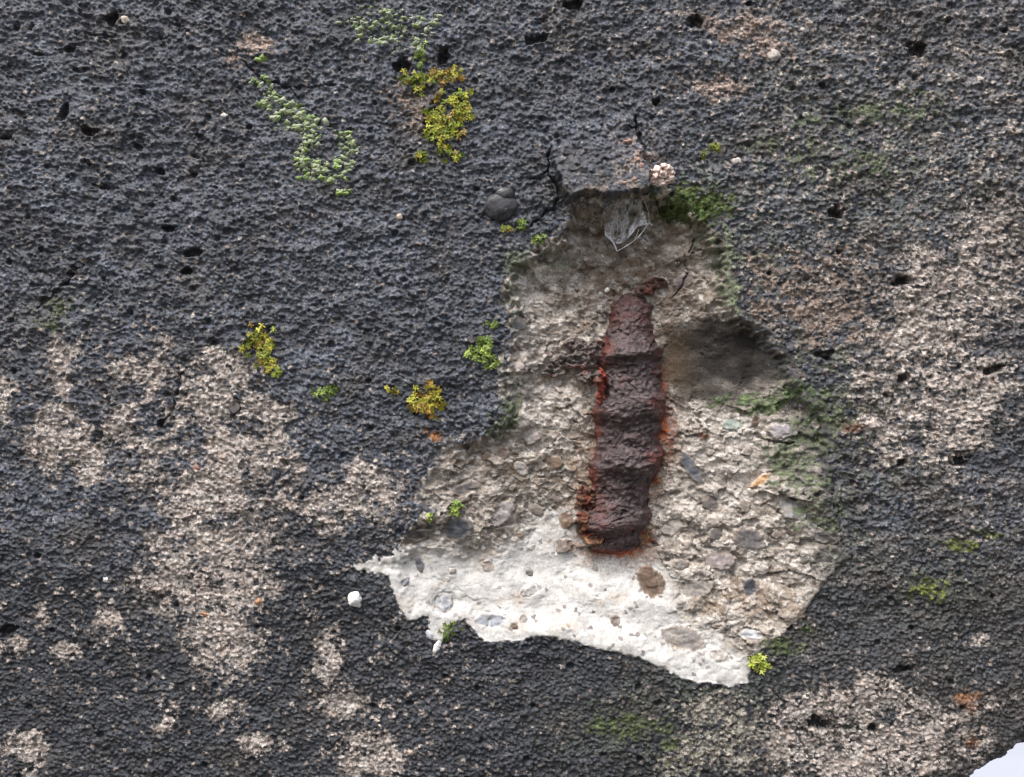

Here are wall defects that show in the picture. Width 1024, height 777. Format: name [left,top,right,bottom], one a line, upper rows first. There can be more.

crack [529,145,564,228]
spalling [354,105,852,687]
corrosion [649,365,711,499]
corrosion [576,484,653,558]